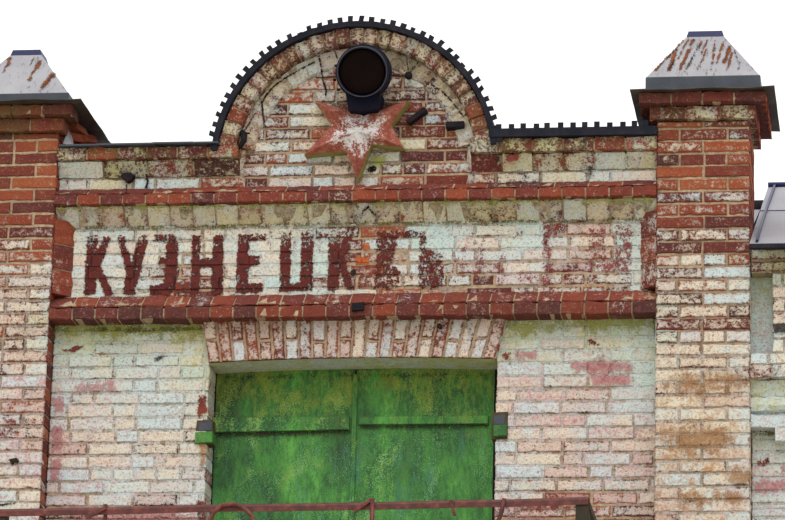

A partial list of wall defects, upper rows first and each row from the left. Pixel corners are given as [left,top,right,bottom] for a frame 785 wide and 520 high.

rust [652,39,740,70]
crack [244,51,338,131]
spalling [366,154,386,173]
peeling [543,224,565,250]